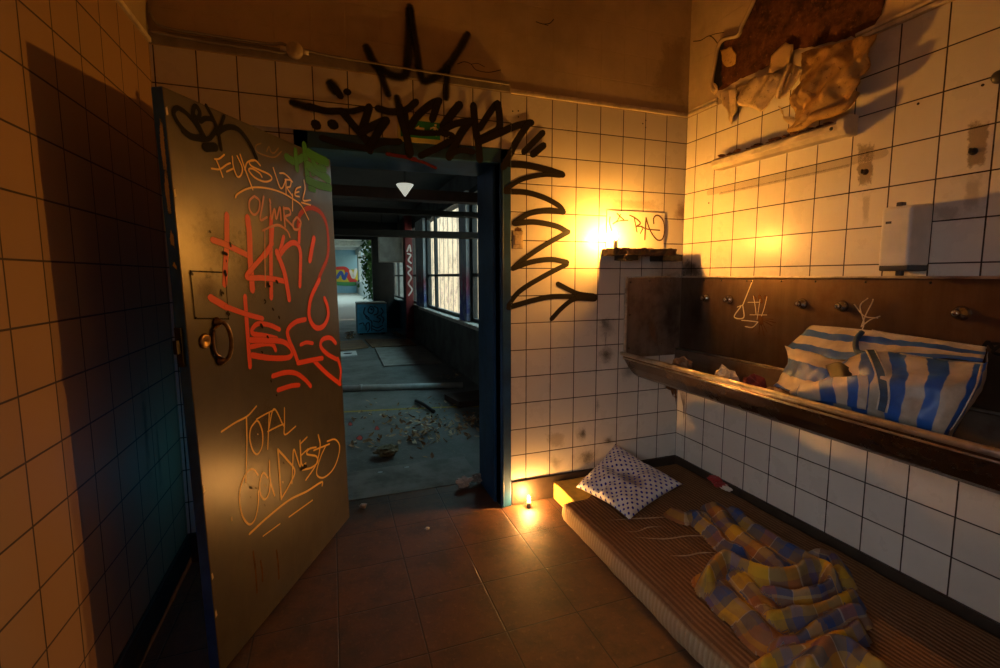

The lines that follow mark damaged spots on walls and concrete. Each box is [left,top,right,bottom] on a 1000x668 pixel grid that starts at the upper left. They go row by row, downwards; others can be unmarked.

peeling [710,0,885,157]